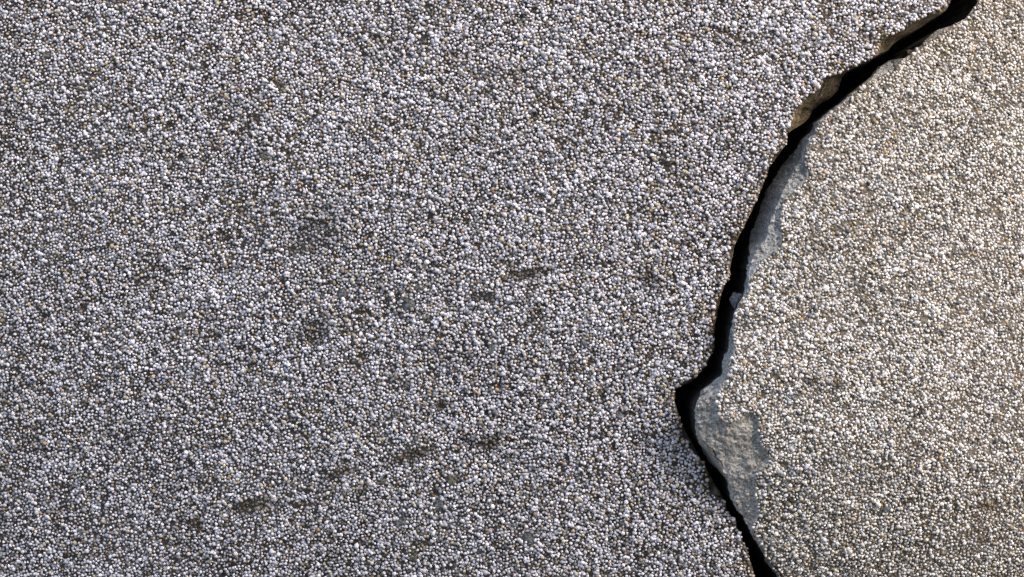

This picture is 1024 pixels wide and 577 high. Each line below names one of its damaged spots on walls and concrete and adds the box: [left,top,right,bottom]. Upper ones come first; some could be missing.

spalling [694,354,770,536]
crack [672,0,979,577]